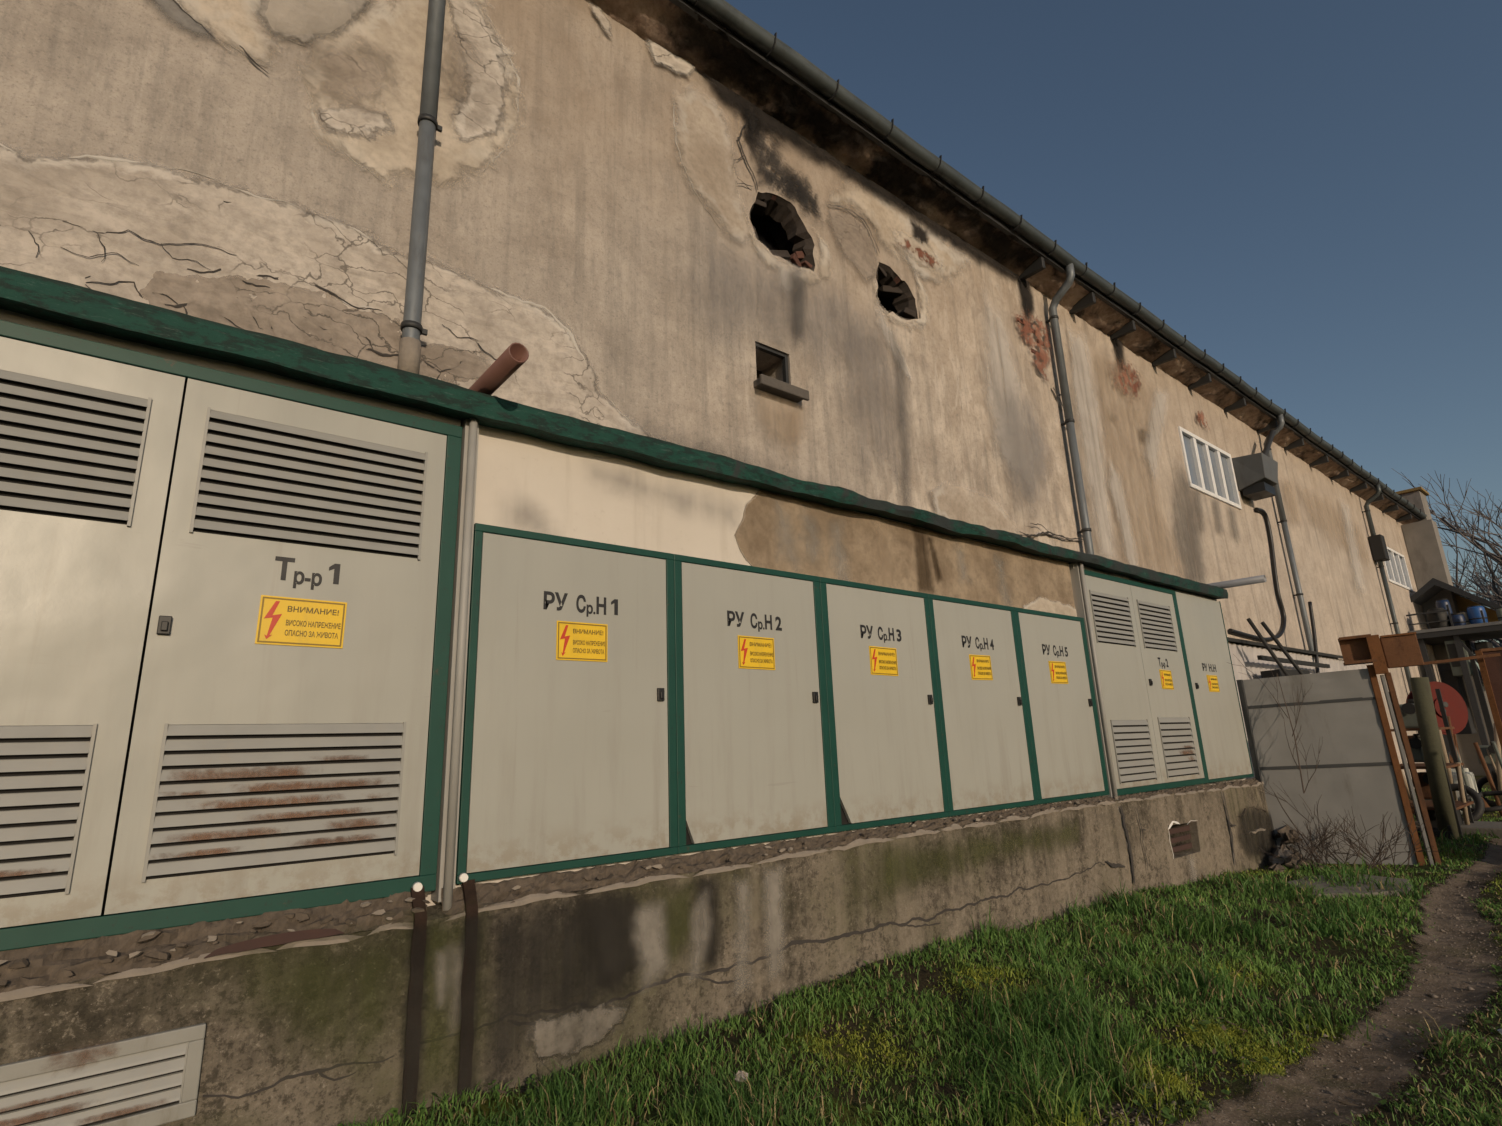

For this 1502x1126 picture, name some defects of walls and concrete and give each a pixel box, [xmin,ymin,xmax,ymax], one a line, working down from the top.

peeling [154,0,521,185]
crack [29,221,497,379]
peeling [645,41,968,379]
water stain [911,222,928,245]
peeling [735,484,1075,609]
rust [186,769,374,856]
water stain [488,900,665,1077]
spalling [529,1003,630,1059]
spalling [0,778,1264,1002]
crack [202,806,1148,1099]
water stain [766,873,782,975]
spalling [1237,807,1277,856]